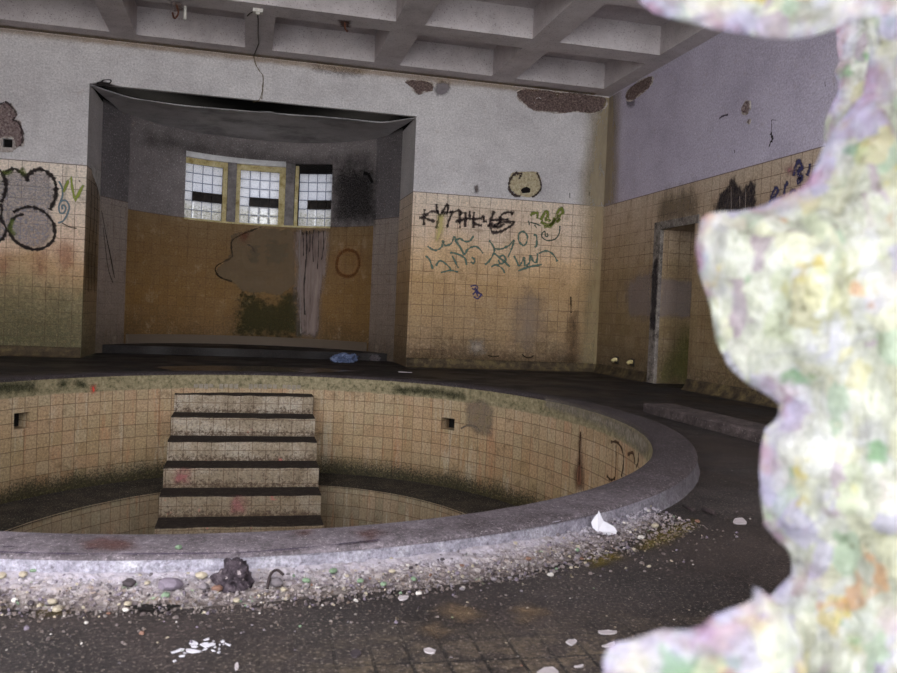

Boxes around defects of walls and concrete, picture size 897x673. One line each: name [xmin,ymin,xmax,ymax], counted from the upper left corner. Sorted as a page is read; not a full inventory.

flaking render [0,101,24,153]
spalling [93,79,415,131]
flaking render [405,79,449,95]
flaking render [516,88,608,114]
flaking render [625,76,654,107]
damp [332,168,375,224]
damp [294,230,328,337]